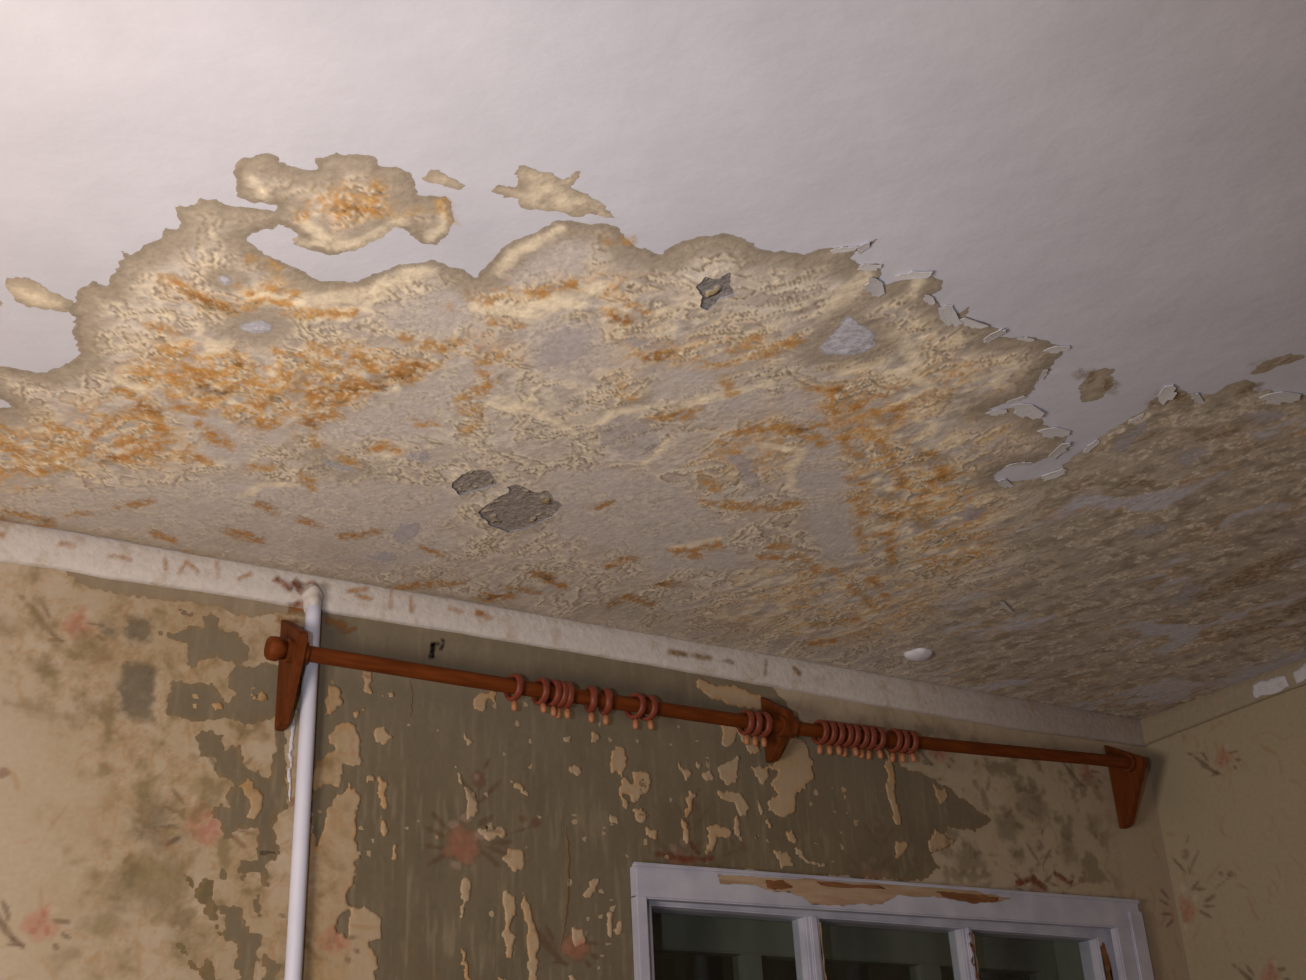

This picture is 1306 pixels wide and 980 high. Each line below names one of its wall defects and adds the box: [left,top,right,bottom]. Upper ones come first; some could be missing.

peeling [0,153,1306,719]
water stain [110,620,149,640]
corrosion [274,577,311,623]
water stain [118,664,154,718]
flaking render [66,571,305,980]
water stain [287,709,297,802]
flaking render [310,612,1010,980]
peeling [1100,942,1113,980]